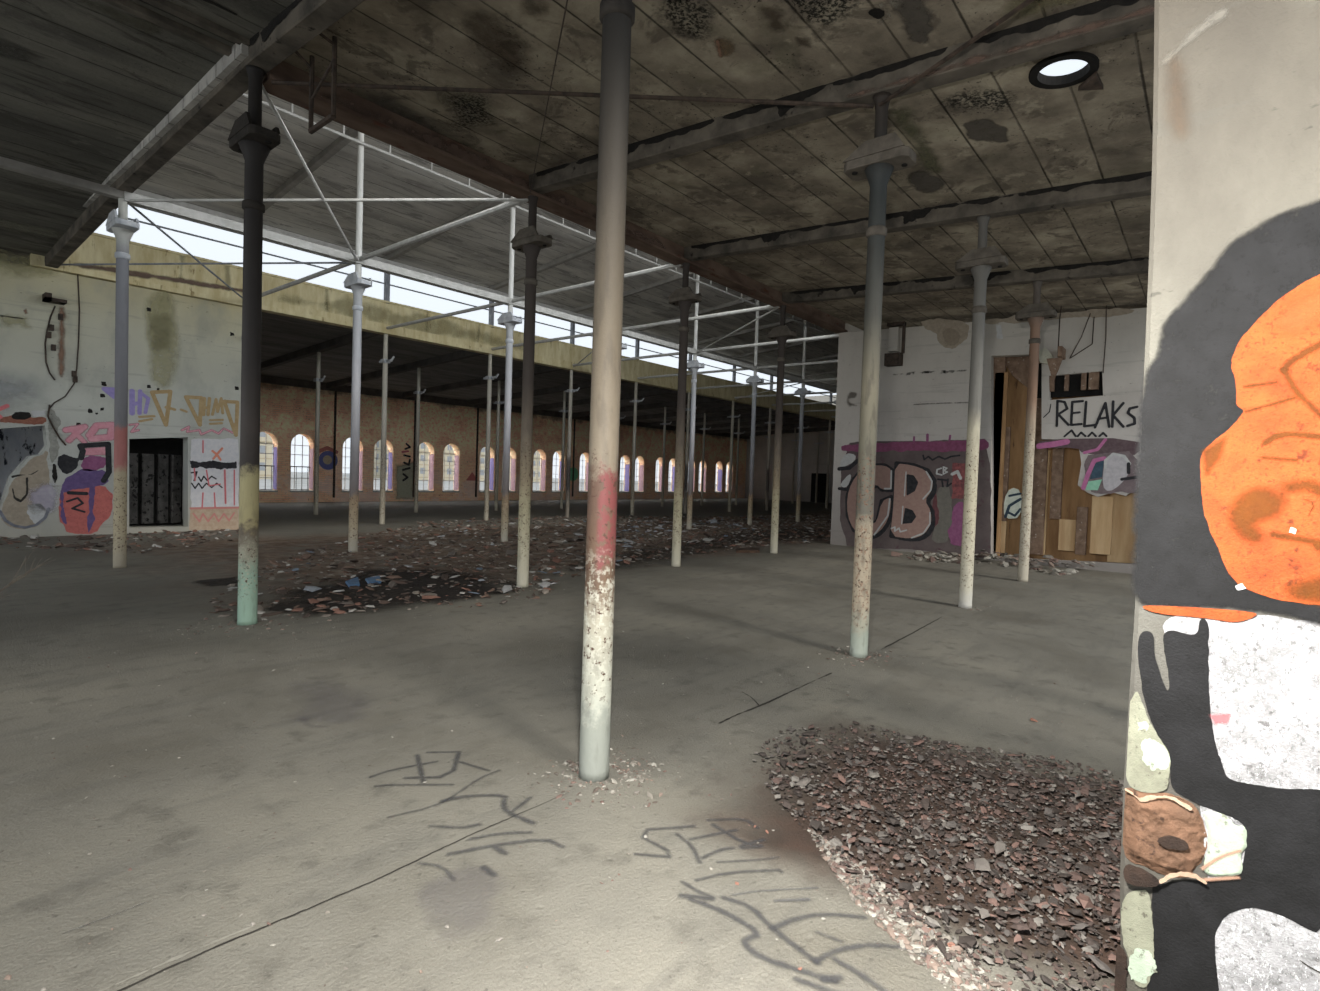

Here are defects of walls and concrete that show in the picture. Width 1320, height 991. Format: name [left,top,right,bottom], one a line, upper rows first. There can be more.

leakage [666,0,712,37]
leakage [792,0,857,24]
leakage [941,91,1010,142]